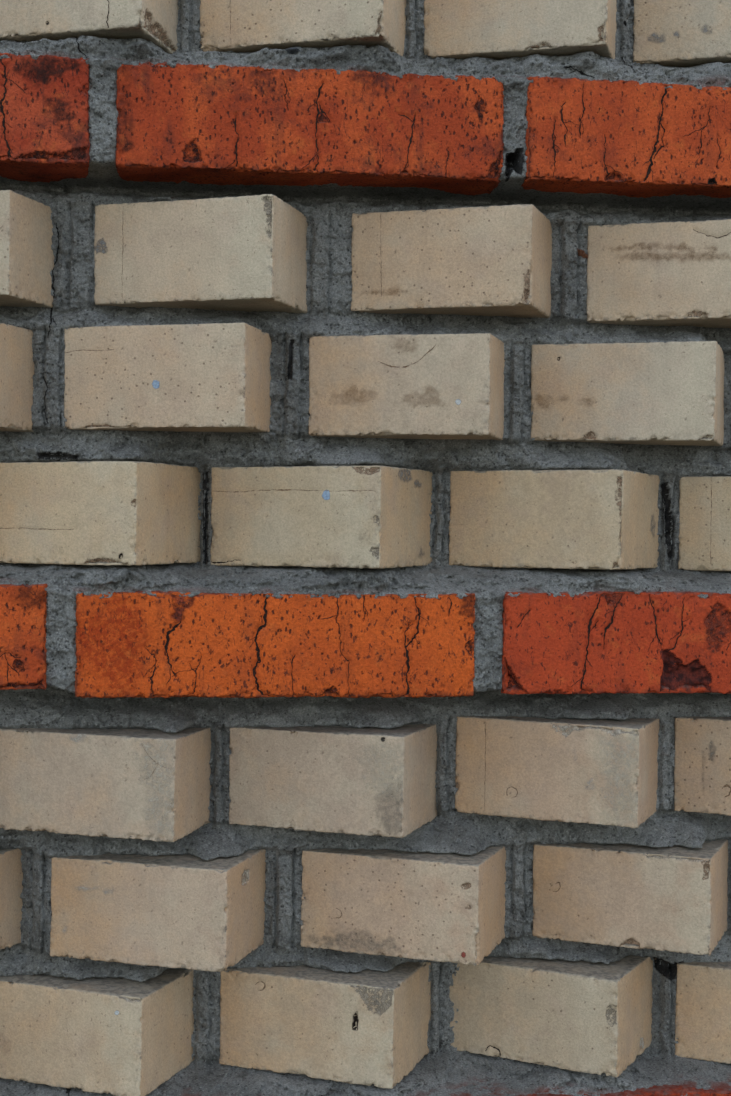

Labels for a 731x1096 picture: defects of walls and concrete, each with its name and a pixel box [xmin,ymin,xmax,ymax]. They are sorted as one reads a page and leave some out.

crack [0,59,25,157]
crack [552,66,721,181]
crack [145,621,202,693]
crack [249,597,268,695]
crack [404,597,452,695]
crack [571,596,622,688]
crack [648,596,687,652]
spalling [660,649,712,692]
spalling [704,603,731,651]